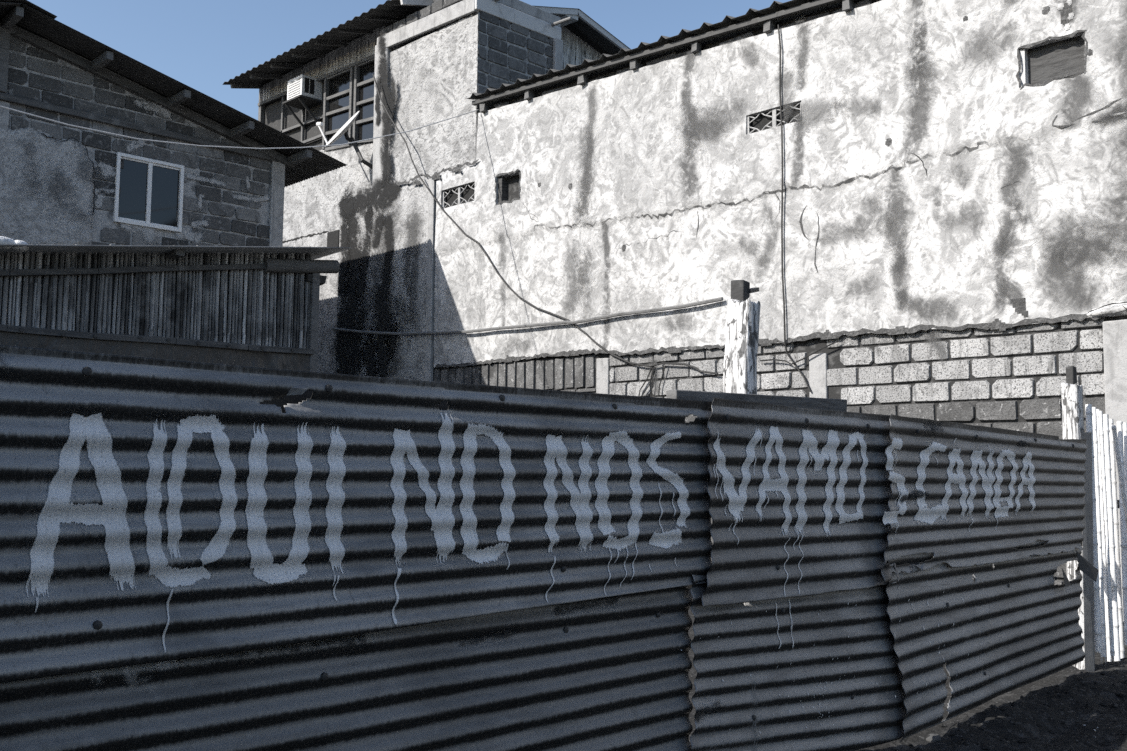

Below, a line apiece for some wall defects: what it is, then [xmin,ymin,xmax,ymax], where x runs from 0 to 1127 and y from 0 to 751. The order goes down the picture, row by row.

leakage [333,32,419,378]
leakage [681,50,697,196]
crack [523,141,982,246]
leakage [905,0,931,155]
leakage [888,170,953,318]
leakage [994,145,1029,310]
leakage [1064,73,1089,126]
leakage [1045,175,1127,309]
leakage [1096,91,1127,124]